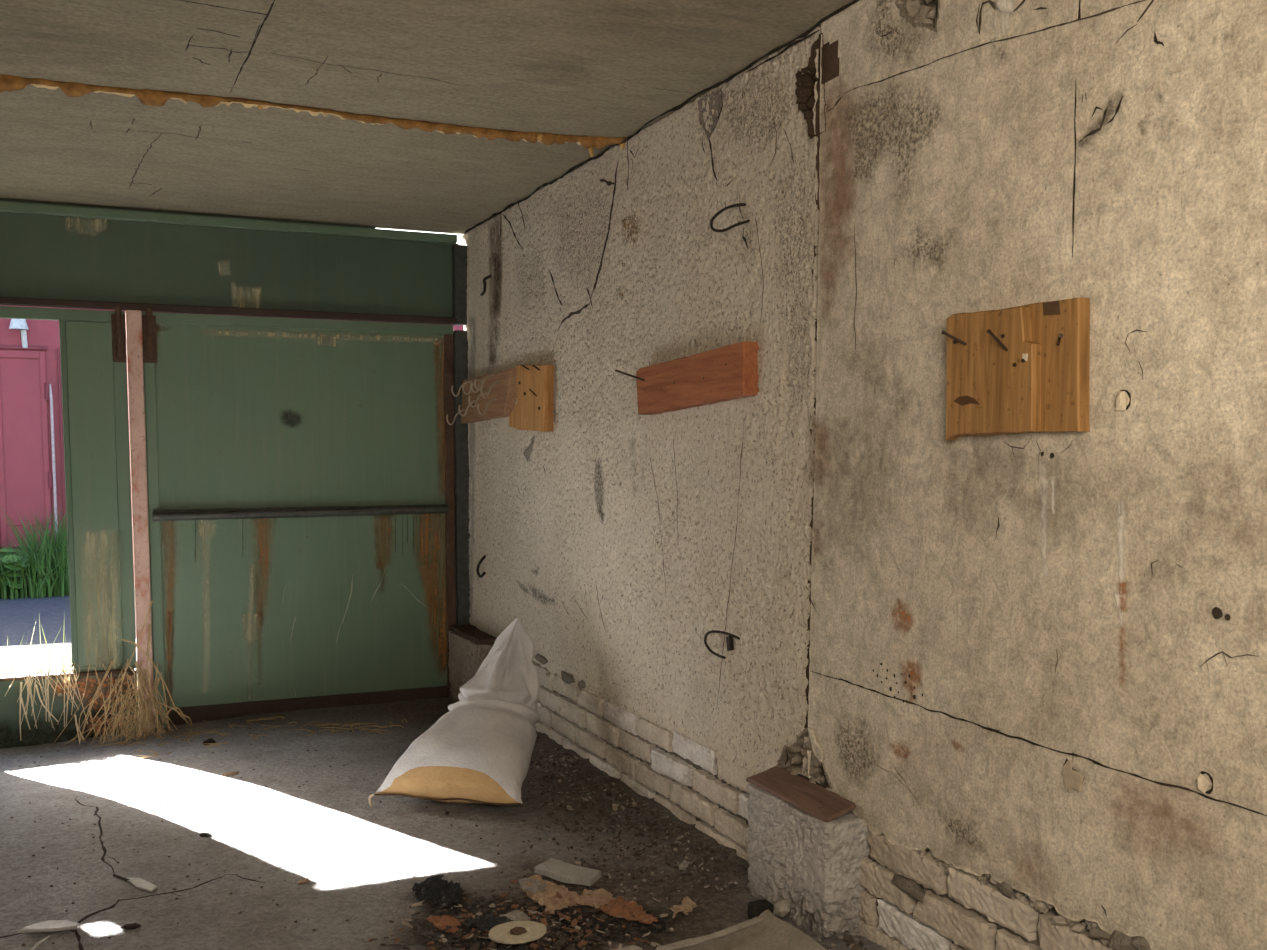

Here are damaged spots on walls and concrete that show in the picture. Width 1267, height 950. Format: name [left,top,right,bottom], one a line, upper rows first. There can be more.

crack [180,0,469,93]
spalling [795,33,839,139]
spalling [894,0,940,32]
crack [126,118,201,197]
crack [465,0,1164,349]
crack [649,441,678,599]
crack [716,421,744,710]
crack [803,319,1267,816]
water stain [1039,461,1055,575]
spalling [776,727,832,790]
crack [75,797,266,950]
spalling [913,849,1109,946]